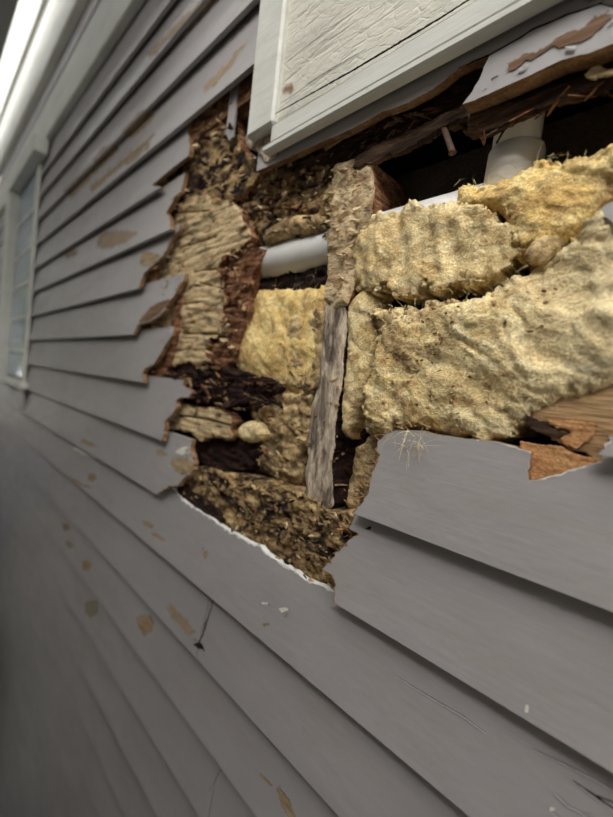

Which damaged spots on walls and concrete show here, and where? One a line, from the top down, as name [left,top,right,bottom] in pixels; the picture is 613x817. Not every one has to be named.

peeling [507,10,613,71]
peeling [138,299,171,323]
peeling [156,445,194,476]
peeling [255,770,295,817]
crack [573,780,613,812]